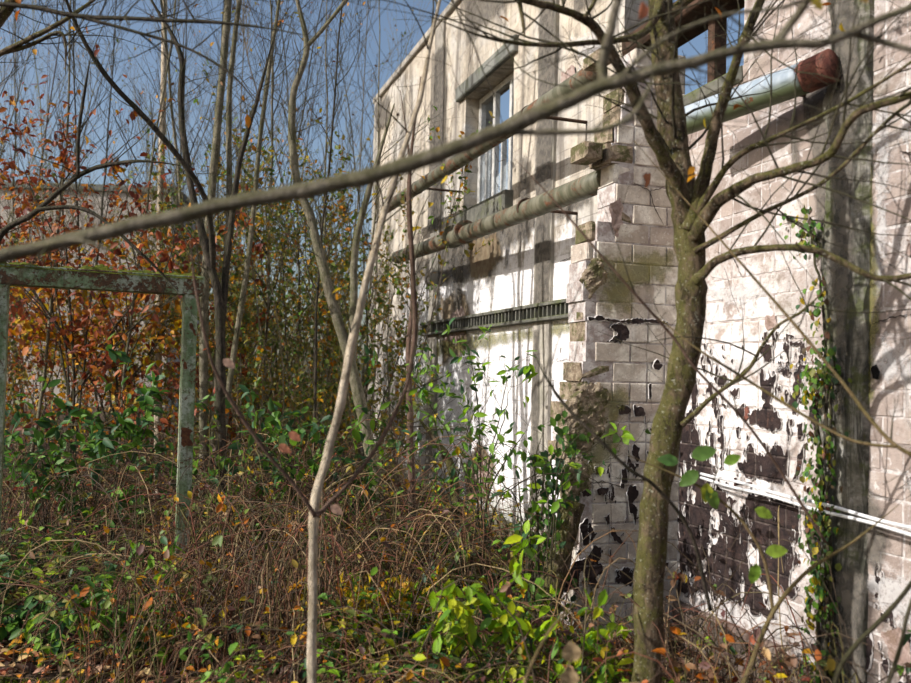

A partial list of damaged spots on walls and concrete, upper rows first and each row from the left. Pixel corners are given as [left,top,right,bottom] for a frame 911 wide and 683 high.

damp [538,0,556,98]
damp [519,119,553,200]
damp [791,86,830,243]
damp [417,199,588,320]
peeling [587,314,668,344]
peeling [616,383,652,431]
peeling [564,444,649,596]
peeling [665,315,822,619]
spalling [866,564,911,683]